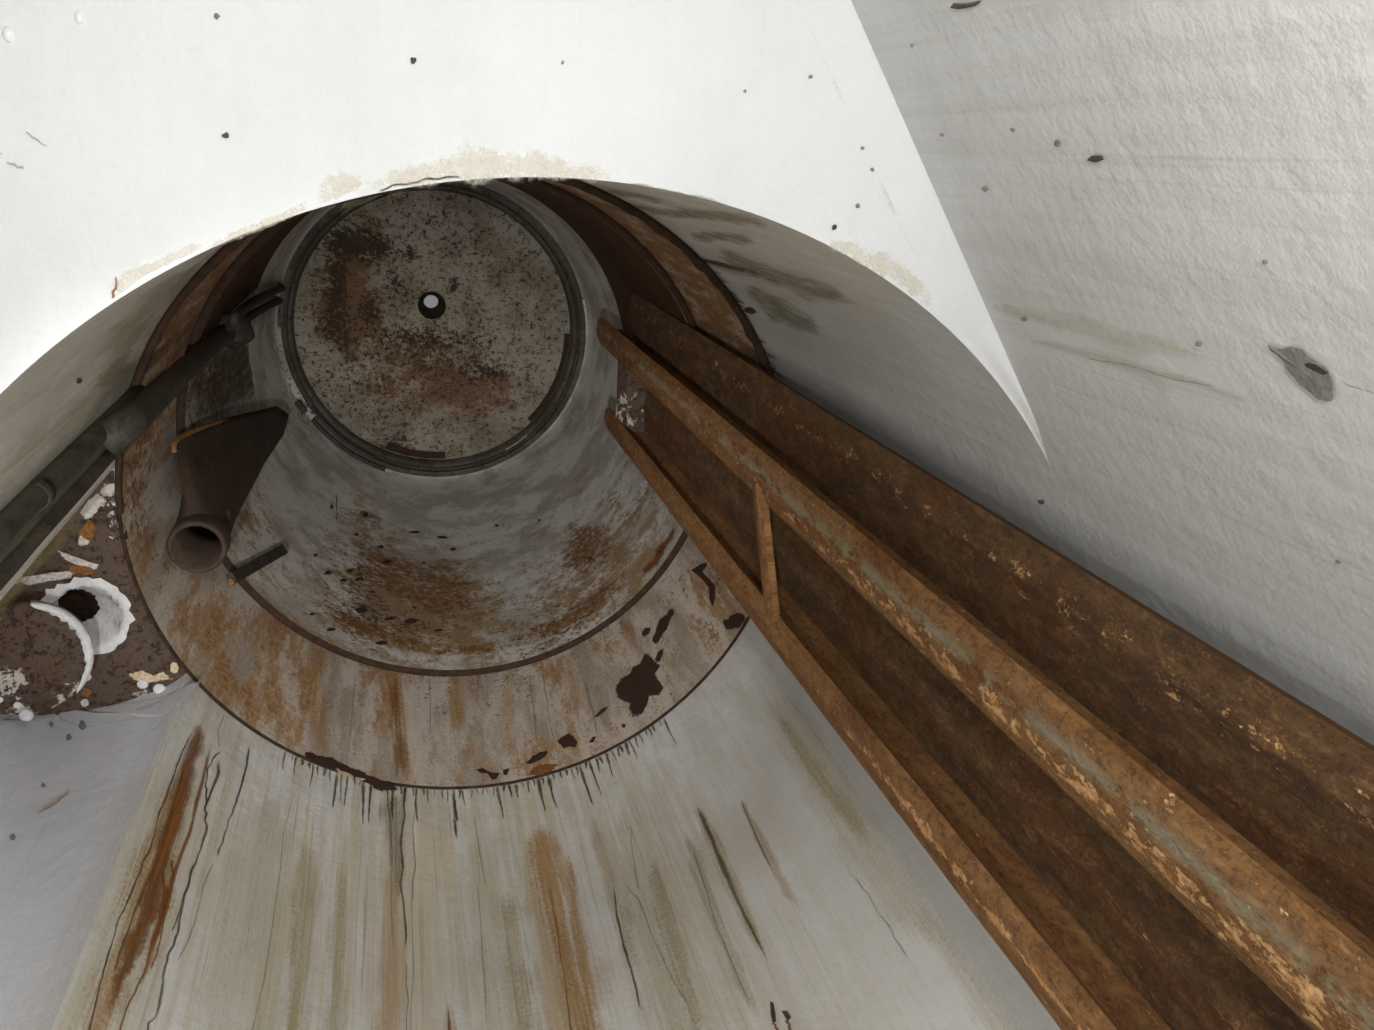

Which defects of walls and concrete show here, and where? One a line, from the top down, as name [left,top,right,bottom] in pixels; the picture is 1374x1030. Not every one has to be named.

spalling [950,0,982,10]
corrosion [561,524,616,570]
corrosion [643,530,674,573]
corrosion [359,549,476,620]
peeling [692,562,715,606]
corrosion [333,608,491,655]
corrosion [512,583,619,646]
peeling [723,612,746,630]
corrosion [111,729,209,1030]
crack [89,738,249,1030]